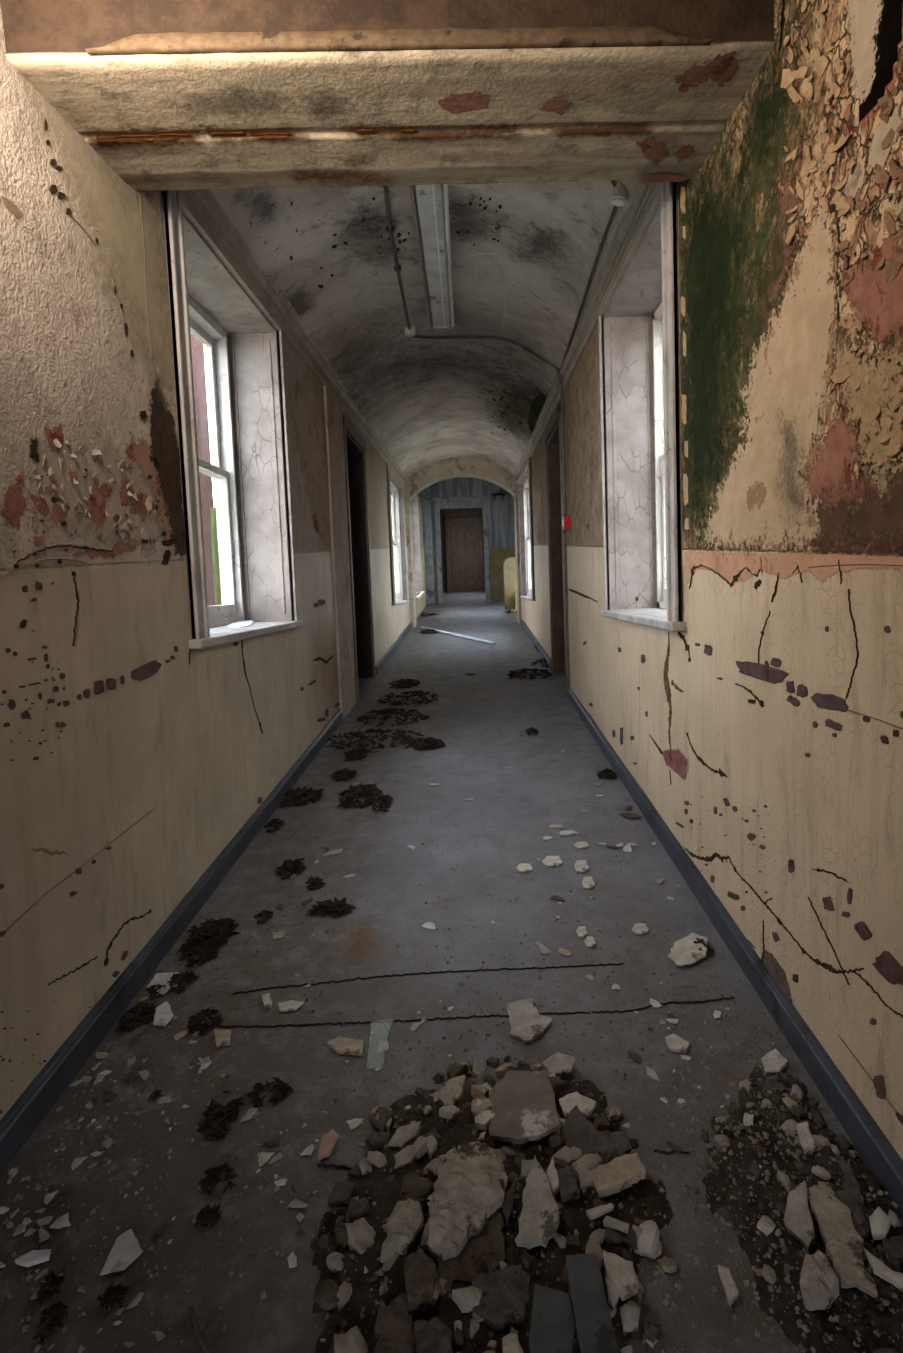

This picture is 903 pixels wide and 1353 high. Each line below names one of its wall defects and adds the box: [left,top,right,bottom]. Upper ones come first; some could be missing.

peeling [438,90,492,114]
crack [859,0,903,122]
flaking render [43,119,134,358]
leakage [449,197,502,246]
leakage [481,379,547,439]
peeling [680,296,688,424]
leakage [678,0,836,551]
flaking render [683,0,903,602]
crack [735,611,771,707]
crack [838,560,859,699]
crack [220,963,734,1028]
crack [684,847,903,1018]